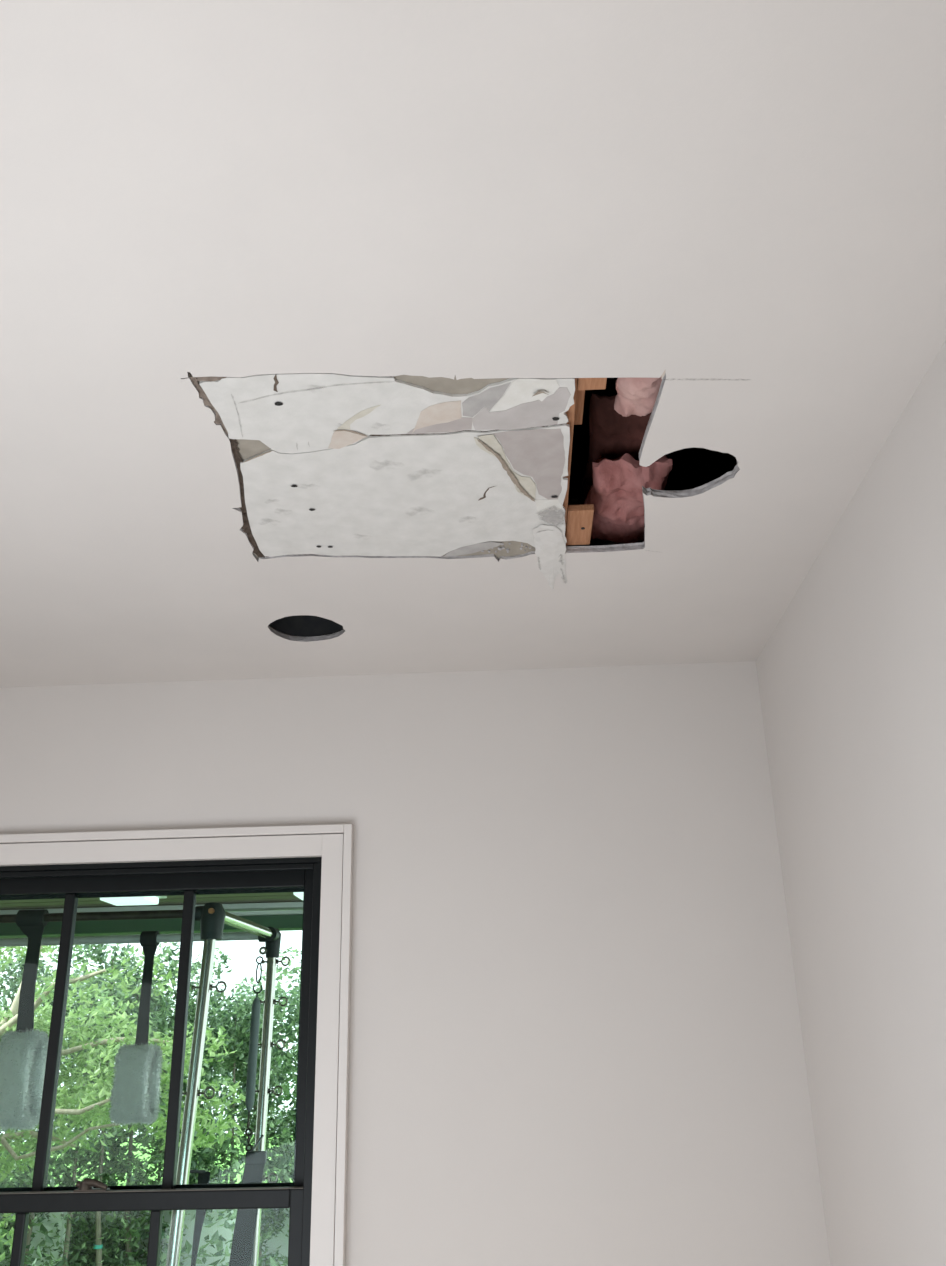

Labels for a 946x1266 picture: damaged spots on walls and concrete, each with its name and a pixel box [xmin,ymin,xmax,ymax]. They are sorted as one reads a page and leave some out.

spalling [181,372,535,562]
hole [565,461,740,553]